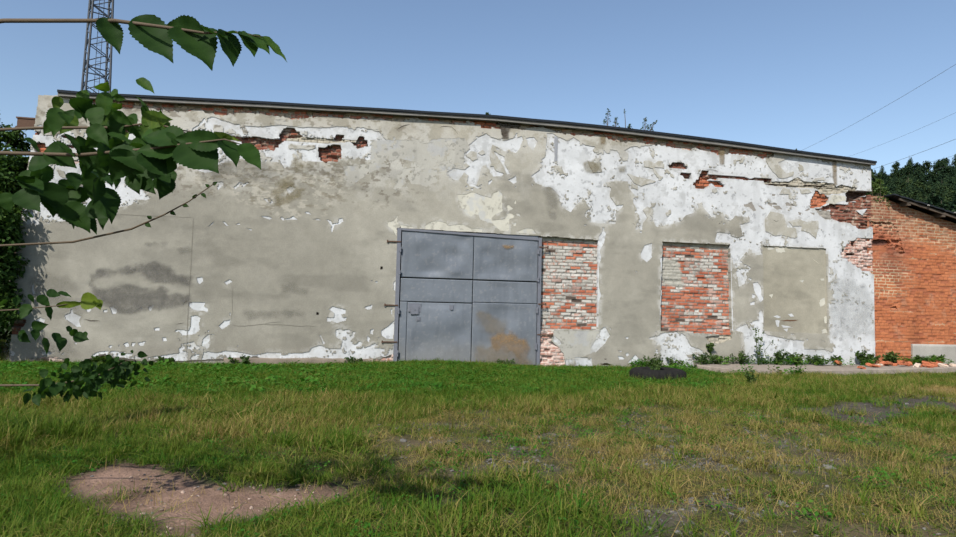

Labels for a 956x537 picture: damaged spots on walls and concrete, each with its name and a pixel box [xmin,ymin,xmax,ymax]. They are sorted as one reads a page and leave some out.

peeling [29,125,87,187]
peeling [22,203,65,227]
peeling [93,100,956,369]
leakage [96,264,188,312]
peeling [65,309,91,327]